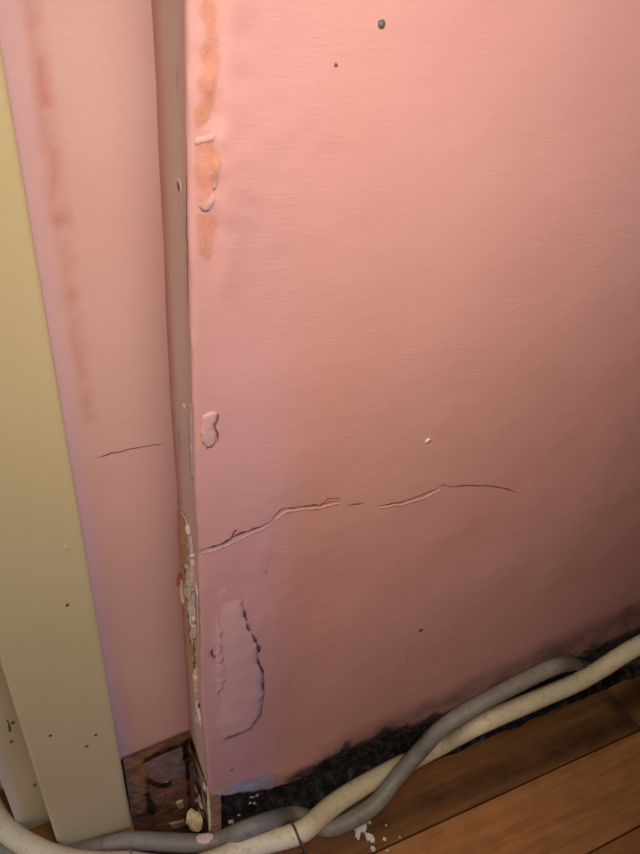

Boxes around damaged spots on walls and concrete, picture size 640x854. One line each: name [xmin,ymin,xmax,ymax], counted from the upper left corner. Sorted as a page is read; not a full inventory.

crack [97,444,161,458]
peeling [183,404,219,480]
crack [178,483,517,553]
peeling [176,506,265,740]
damp [582,628,640,661]
damp [288,712,448,781]
damp [216,774,273,794]
peeling [185,808,203,832]